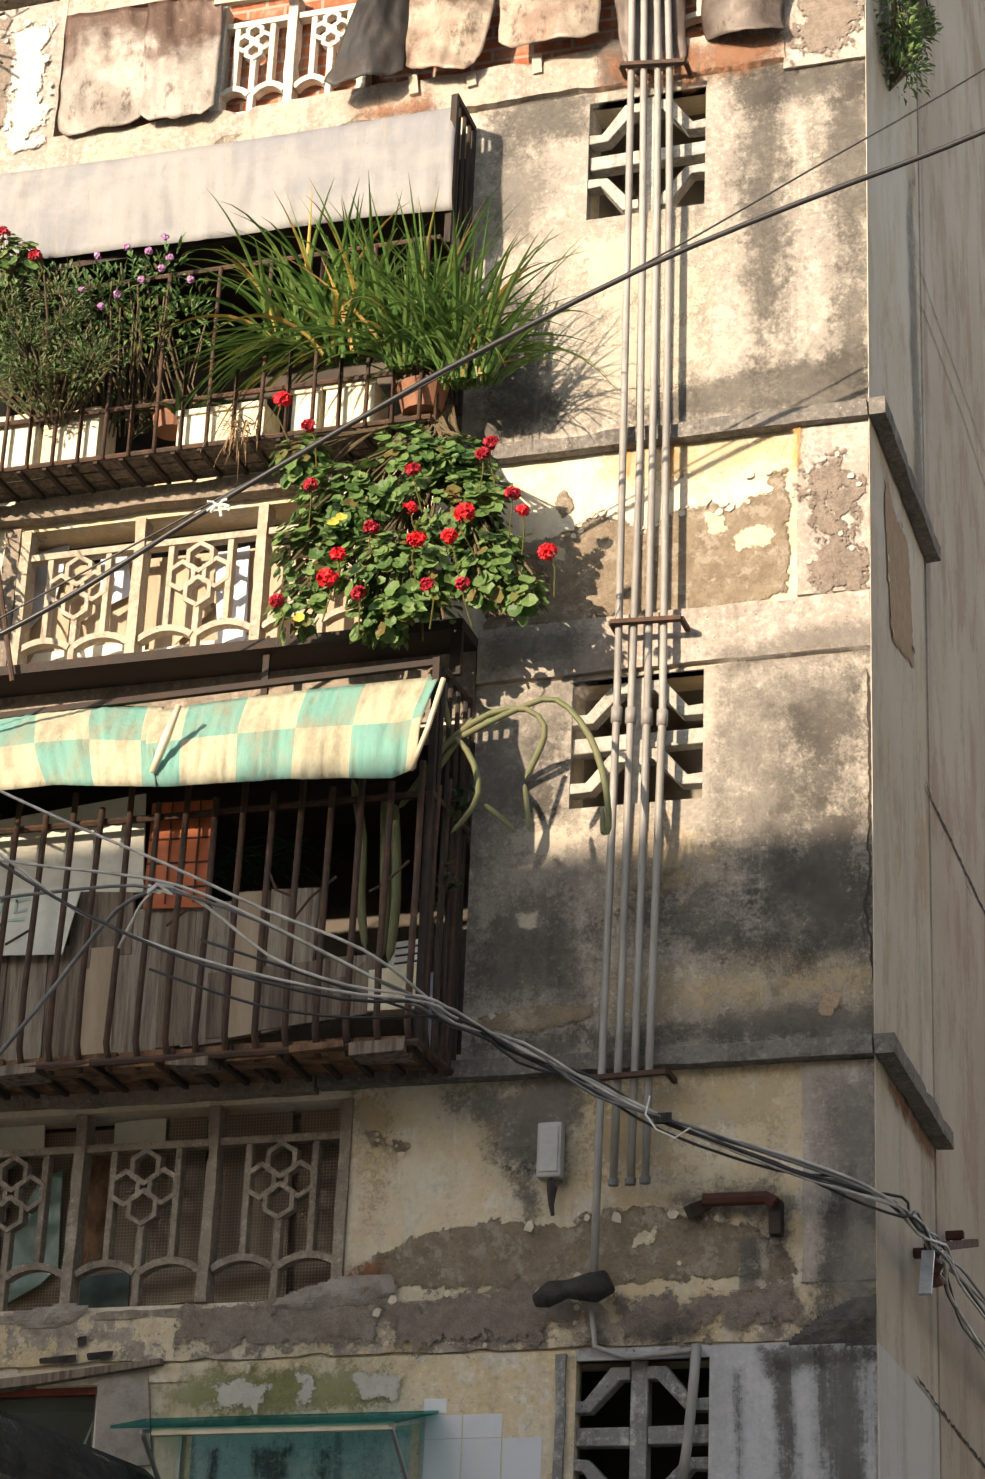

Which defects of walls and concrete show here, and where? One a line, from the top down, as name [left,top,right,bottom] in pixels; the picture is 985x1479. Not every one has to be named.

peeling [0,17,57,159]
peeling [786,0,864,68]
leakage [470,42,868,445]
peeling [482,446,915,668]
leakage [457,621,874,1057]
leakage [445,1077,592,1234]
peeling [171,1202,815,1359]
leakage [758,1345,878,1479]